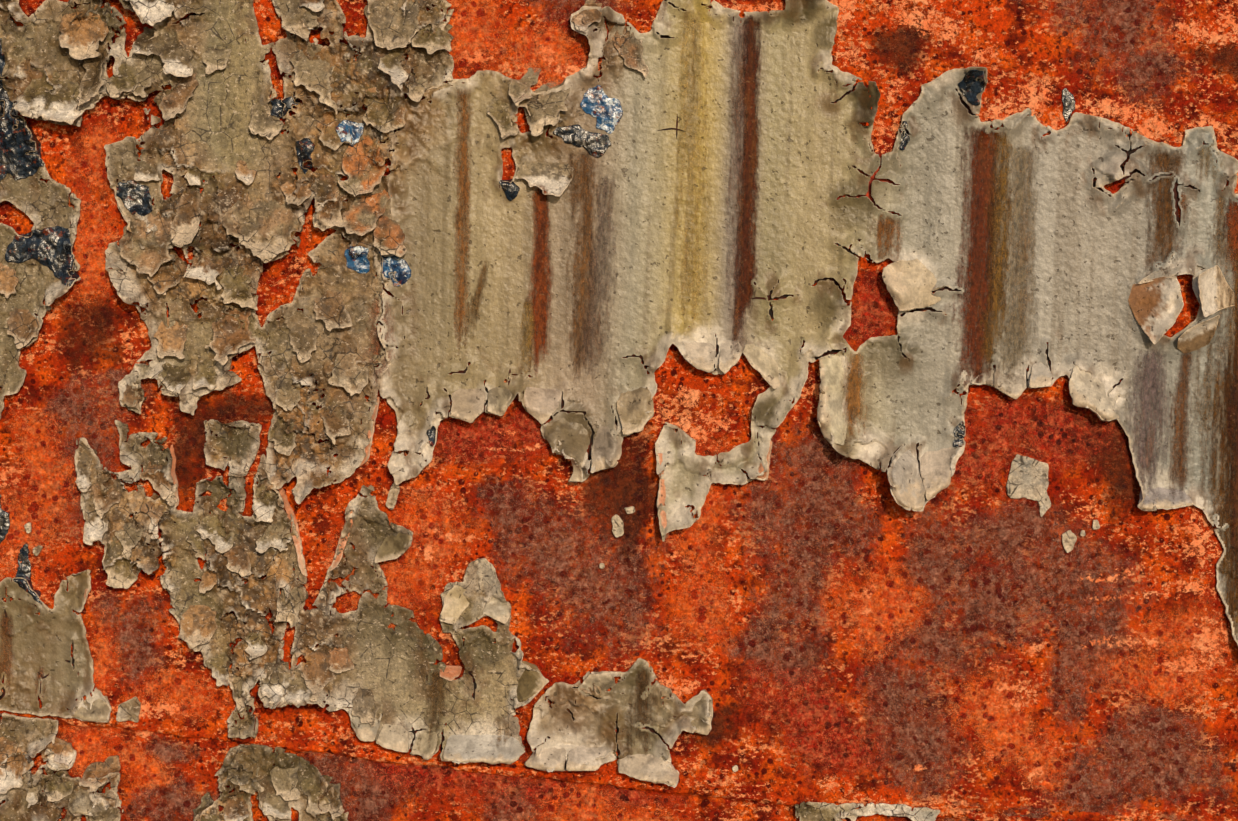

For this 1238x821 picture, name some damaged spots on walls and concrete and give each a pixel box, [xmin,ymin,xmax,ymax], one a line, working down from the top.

peeling [0,0,549,764]
corrosion [521,187,551,371]
corrosion [726,17,760,342]
peeling [376,0,1238,645]
crack [837,152,899,214]
corrosion [954,128,1035,386]
crack [1093,131,1200,225]
corrosion [480,432,659,655]
corrosion [669,197,1238,821]
peeling [0,569,141,821]
peeling [193,744,349,821]
peeling [525,658,713,788]